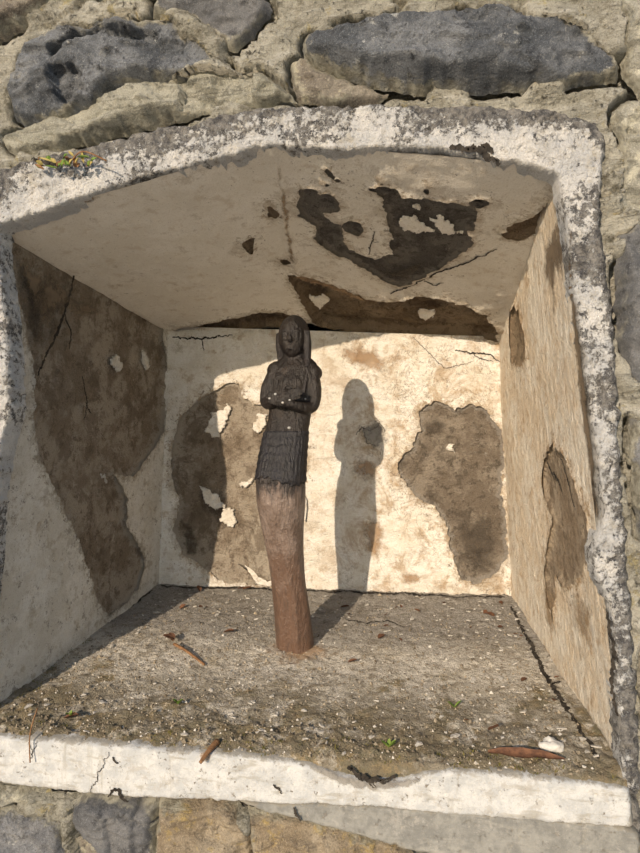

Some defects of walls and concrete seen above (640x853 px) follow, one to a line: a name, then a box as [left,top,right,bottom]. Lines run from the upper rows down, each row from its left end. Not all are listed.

peeling [296,169,489,287]
crack [390,249,497,294]
crack [172,334,230,349]
spalling [197,312,290,329]
spalling [288,275,499,342]
crack [413,337,500,368]
peeling [12,242,167,616]
peeling [171,383,272,587]
peeling [397,401,509,584]
peeling [543,443,588,616]
crack [90,752,129,802]
crack [347,766,396,788]